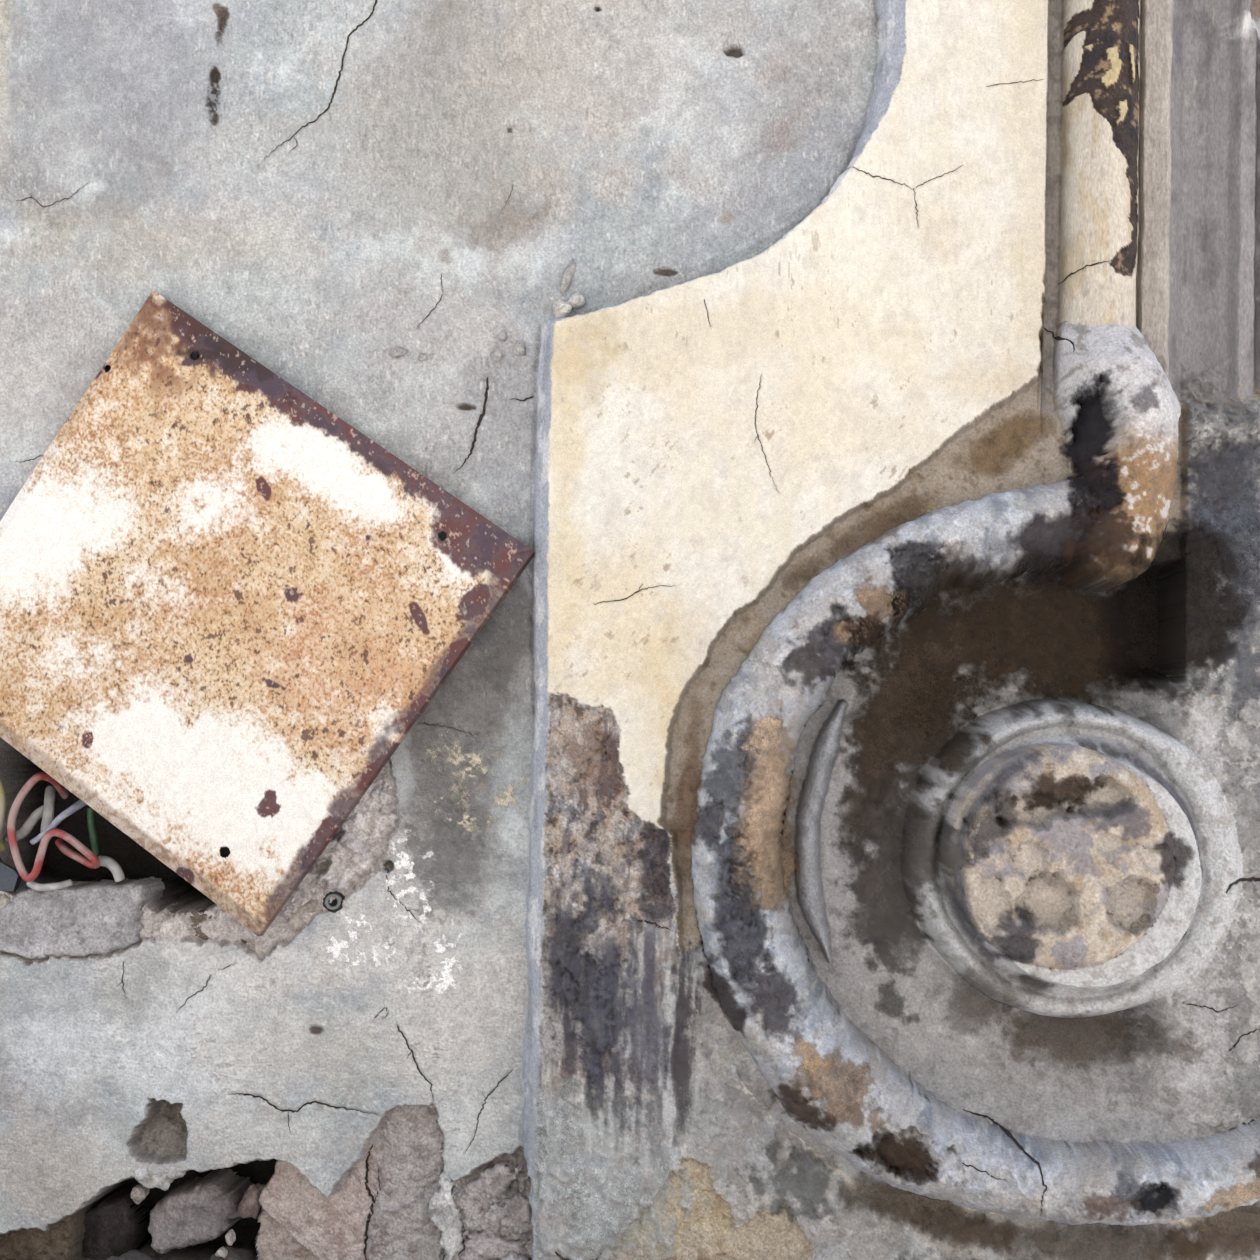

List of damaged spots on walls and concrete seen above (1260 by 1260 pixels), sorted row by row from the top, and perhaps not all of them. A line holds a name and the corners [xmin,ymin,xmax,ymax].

crack [264,0,377,159]
peeling [1063,0,1140,278]
spalling [0,737,463,998]
peeling [540,693,679,1088]
spalling [0,1098,534,1260]
crack [229,1093,381,1260]
crack [465,1069,513,1153]
damp [518,878,691,1260]
spalling [603,1158,815,1260]